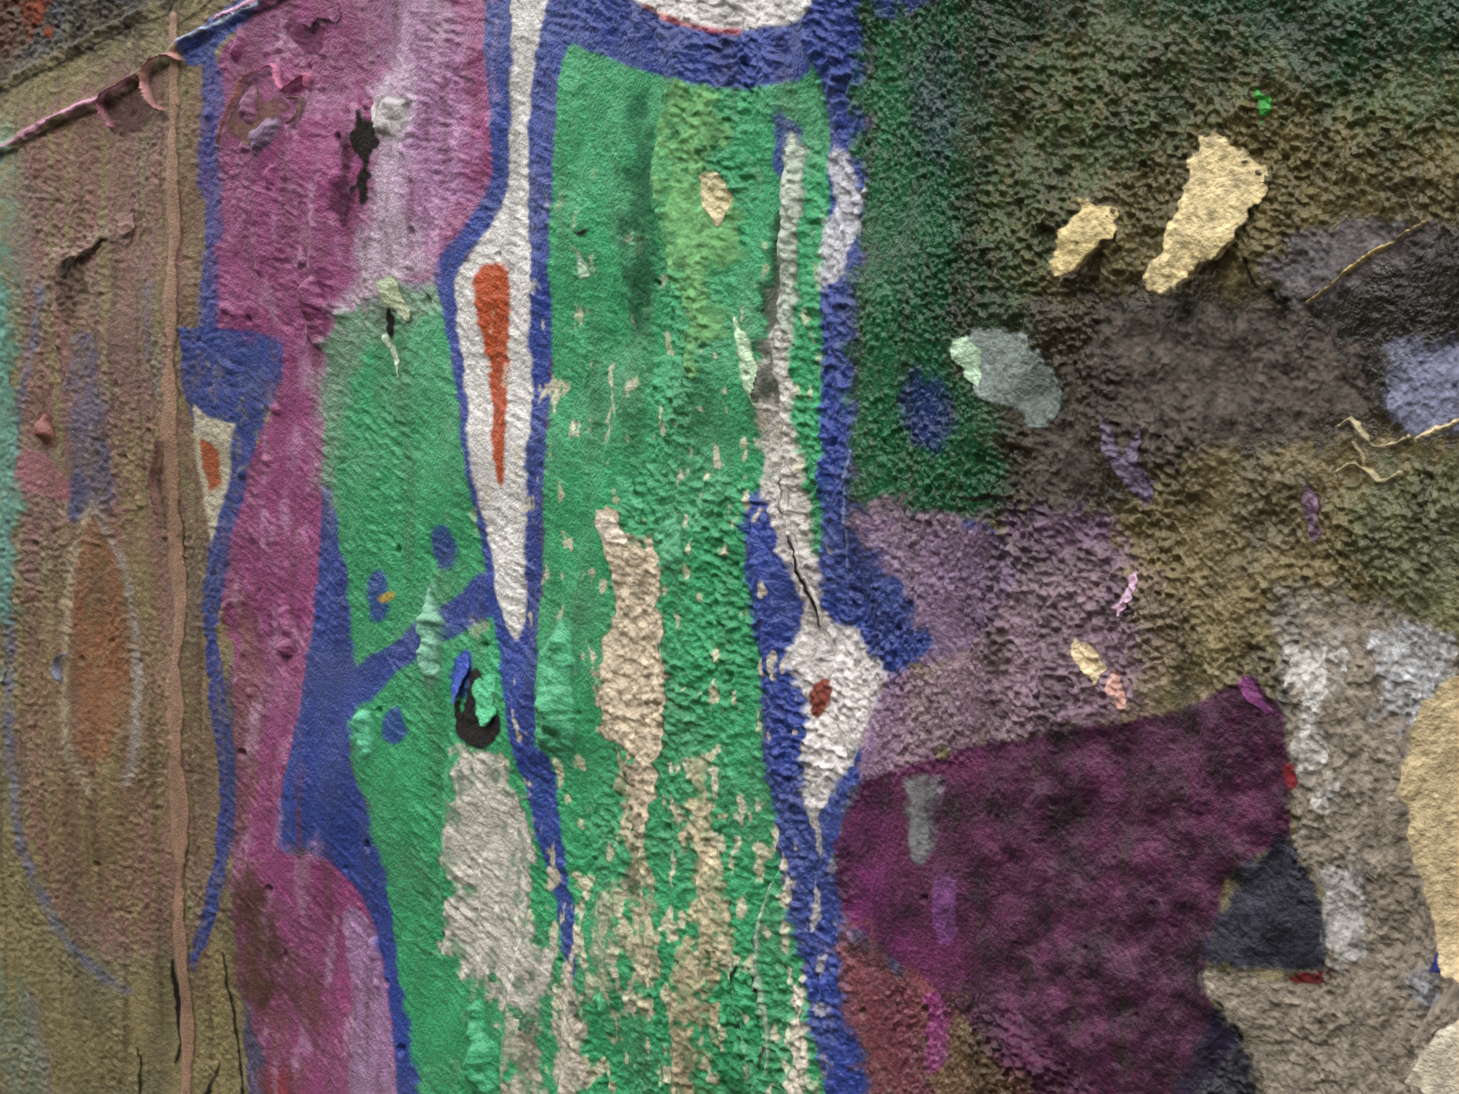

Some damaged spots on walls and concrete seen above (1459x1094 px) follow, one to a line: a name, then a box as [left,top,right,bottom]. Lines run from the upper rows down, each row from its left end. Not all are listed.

crack [0,0,287,156]
peeling [215,63,311,157]
peeling [285,0,341,54]
peeling [950,131,1459,514]
peeling [1302,482,1322,542]
spalling [1203,597,1459,1094]